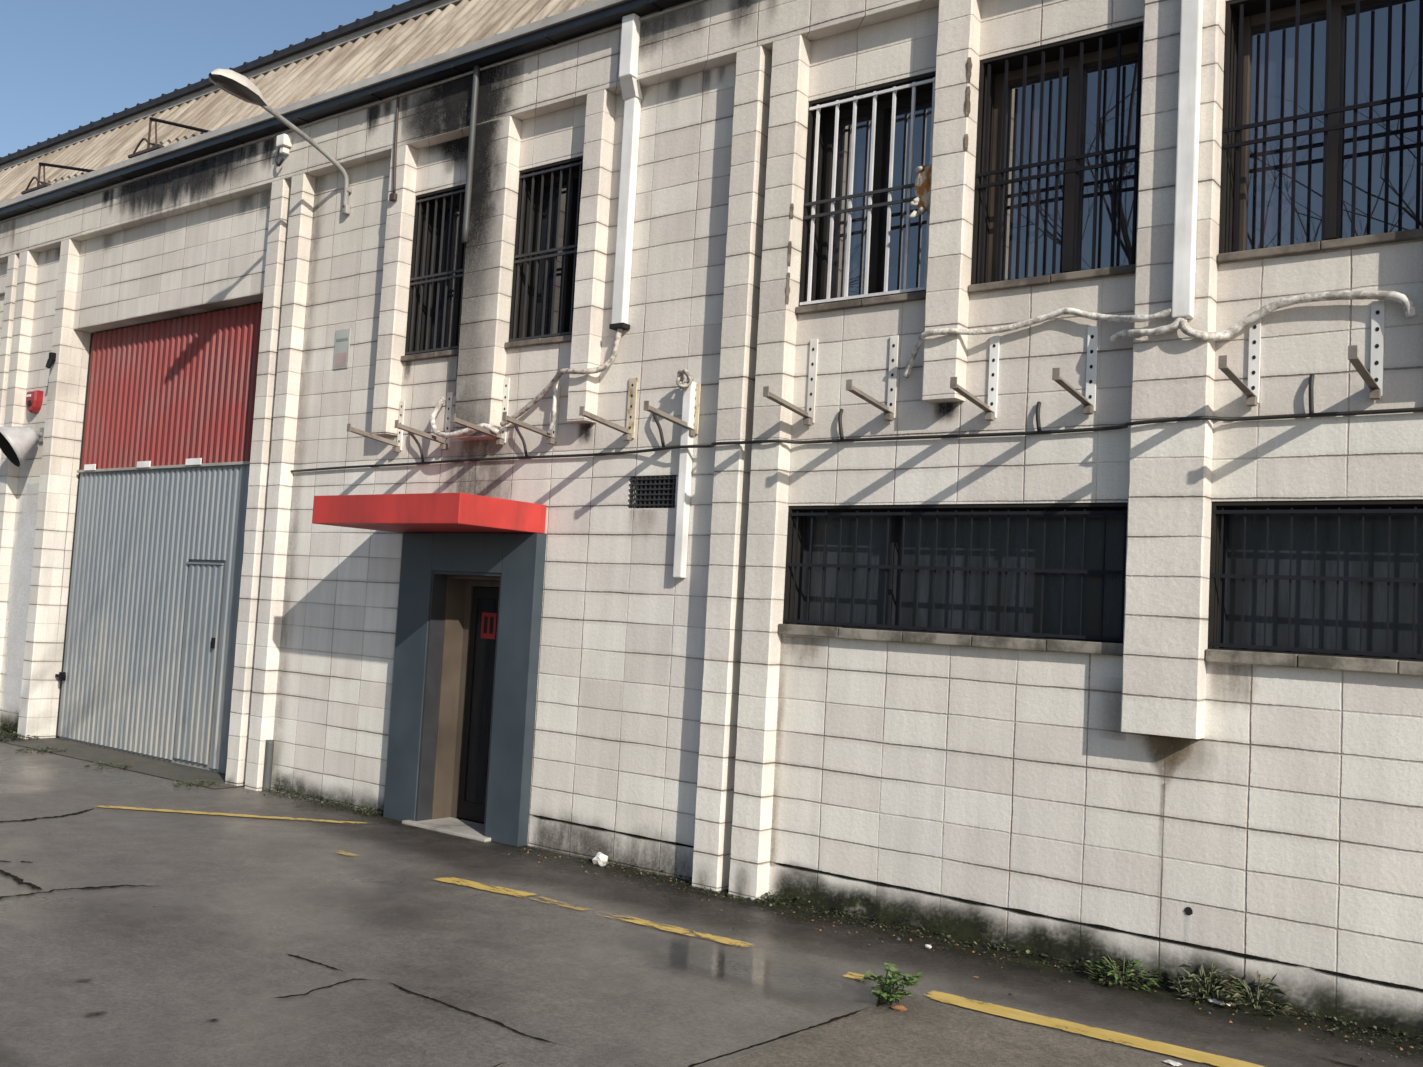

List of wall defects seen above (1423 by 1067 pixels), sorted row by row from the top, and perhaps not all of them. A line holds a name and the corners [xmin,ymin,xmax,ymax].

damp [368,96,407,130]
damp [103,138,274,210]
damp [429,119,500,379]
crack [0,808,94,822]
crack [0,861,145,899]
damp [592,866,1423,1067]
crack [688,1008,867,1067]